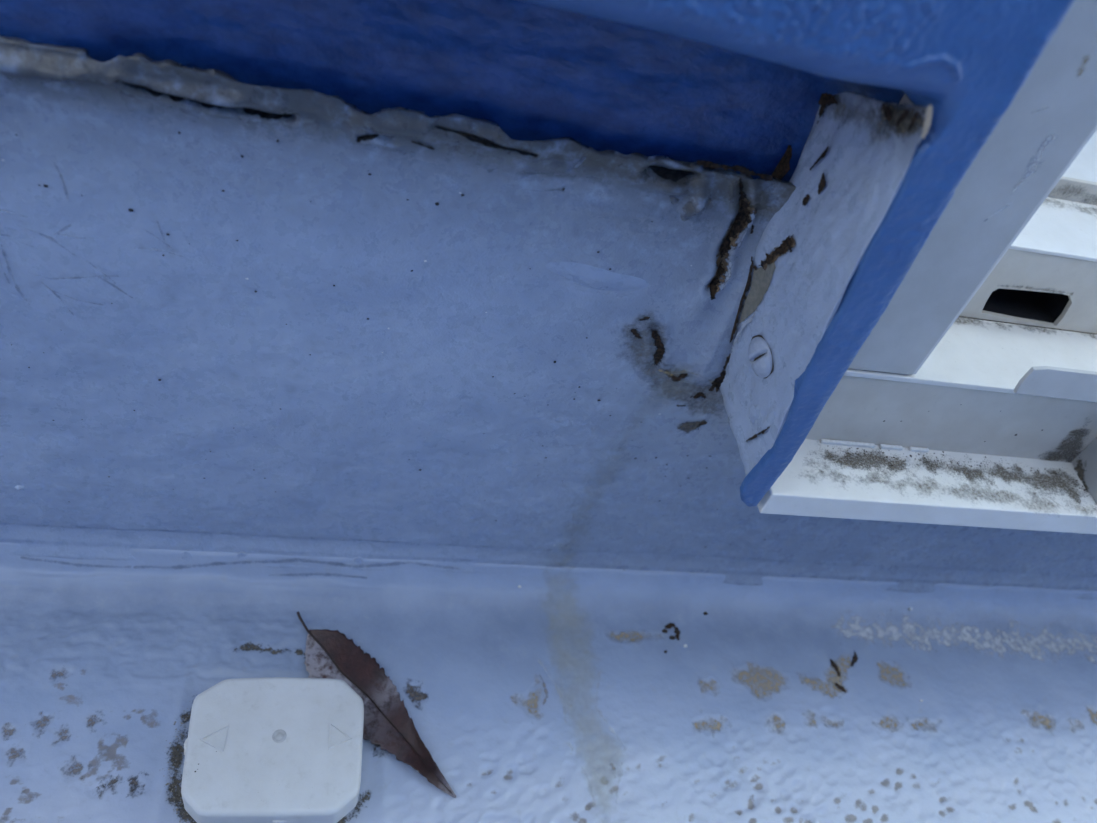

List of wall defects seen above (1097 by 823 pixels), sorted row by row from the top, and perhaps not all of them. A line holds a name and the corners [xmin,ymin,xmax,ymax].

spalling [3,724,23,759]
spalling [98,774,147,797]